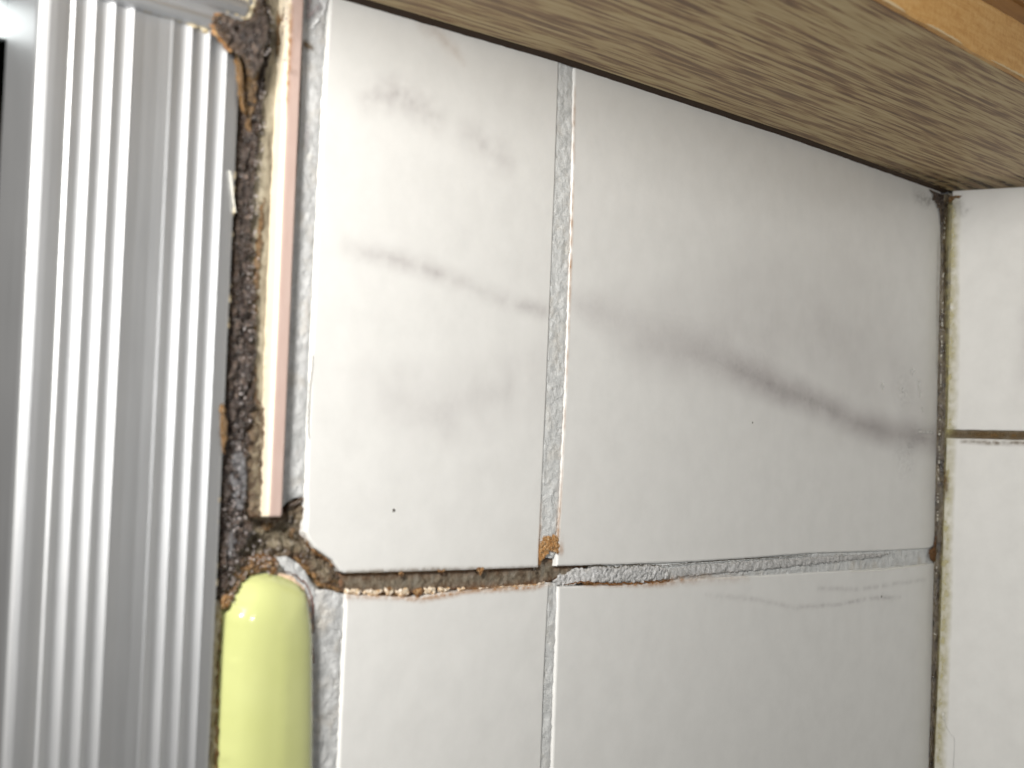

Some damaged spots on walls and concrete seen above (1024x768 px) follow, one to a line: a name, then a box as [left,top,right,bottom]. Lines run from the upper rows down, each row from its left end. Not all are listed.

rust [276,8,291,55]
rust [538,508,560,563]
rust [220,540,286,610]